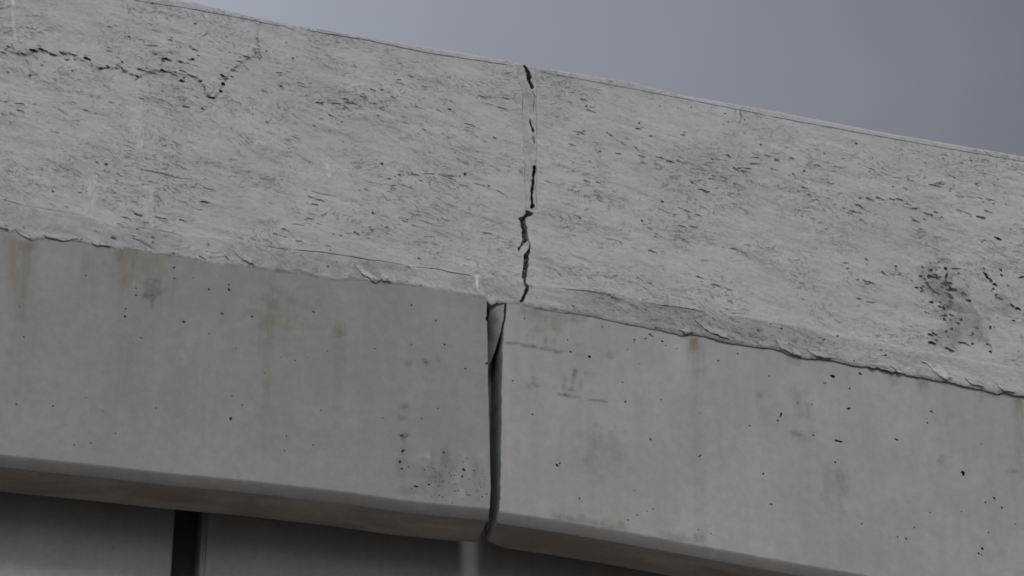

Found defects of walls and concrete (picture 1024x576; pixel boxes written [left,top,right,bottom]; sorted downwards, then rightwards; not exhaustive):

flaking render [0,210,187,251]
crack [518,161,536,303]
spalling [857,263,1024,354]
flaking render [757,323,839,358]
flaking render [920,360,952,380]